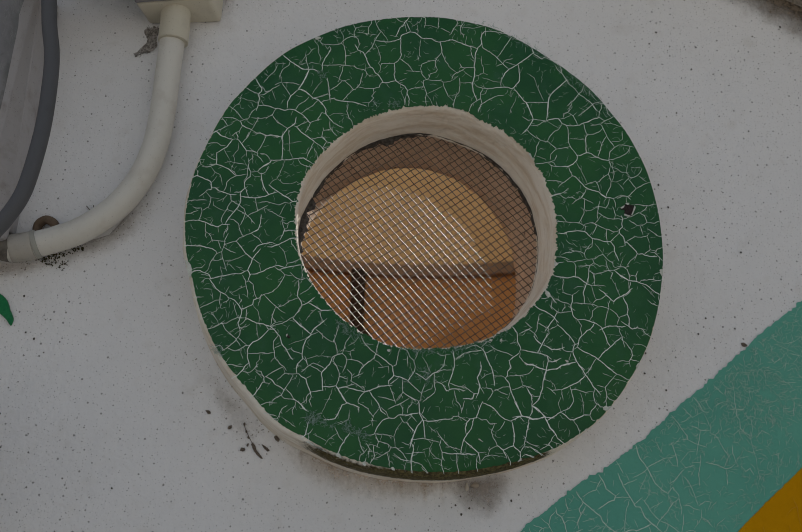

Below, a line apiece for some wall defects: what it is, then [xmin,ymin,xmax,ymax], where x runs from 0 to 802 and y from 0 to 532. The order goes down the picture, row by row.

damp [752,0,802,25]
crack [529,307,802,532]